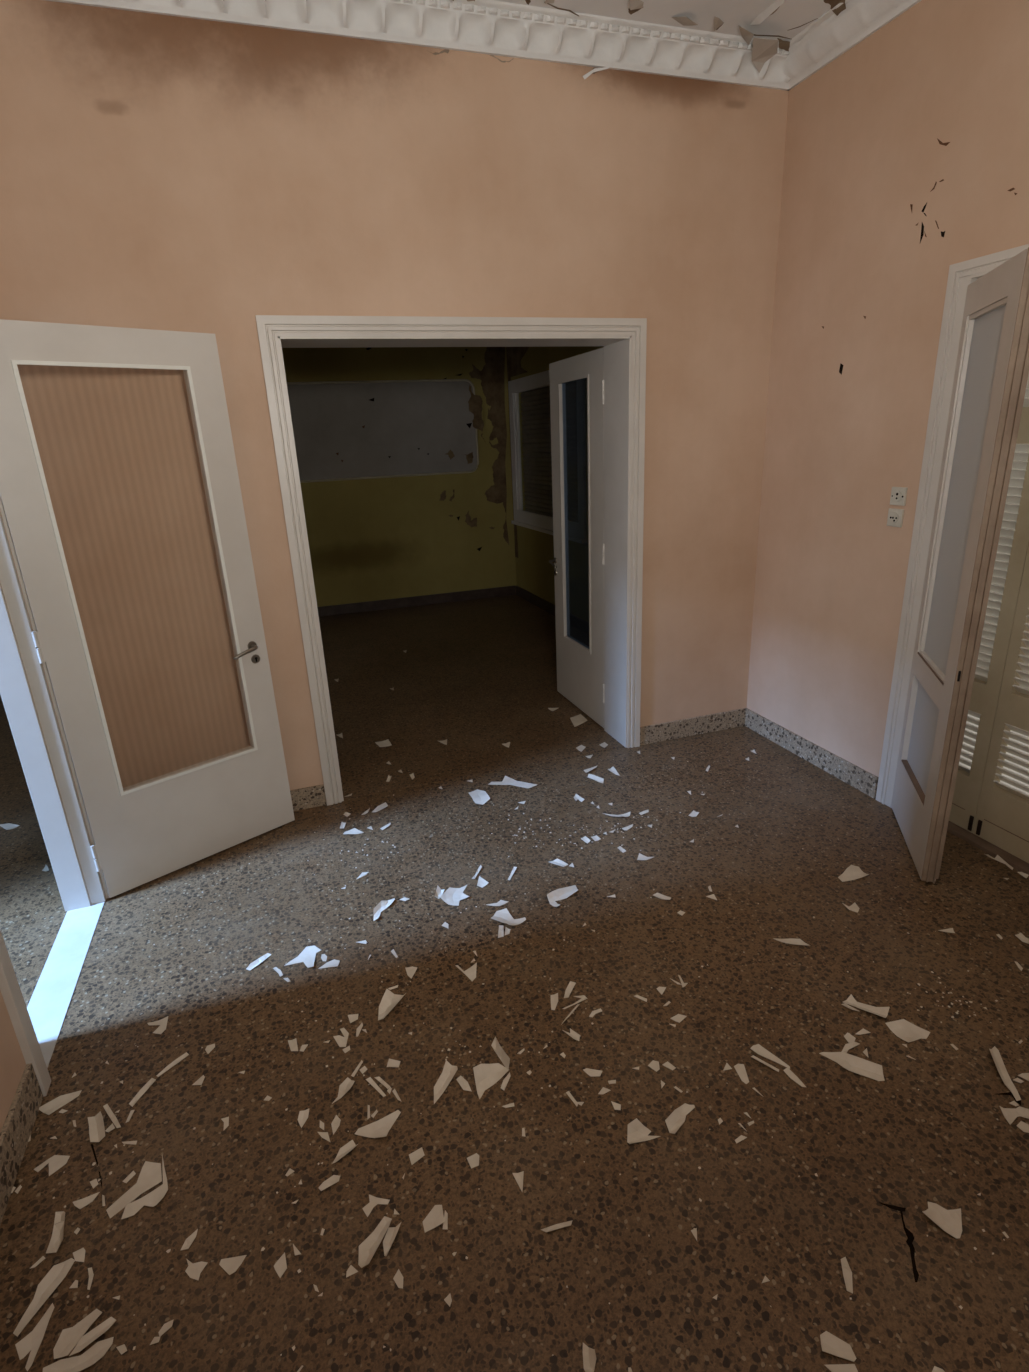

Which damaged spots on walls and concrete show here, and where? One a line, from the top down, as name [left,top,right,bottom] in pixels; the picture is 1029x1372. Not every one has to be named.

peeling [628,0,644,14]
flaking render [823,0,846,16]
peeling [671,0,791,73]
crack [999,1092,1021,1105]
crack [879,1202,919,1282]